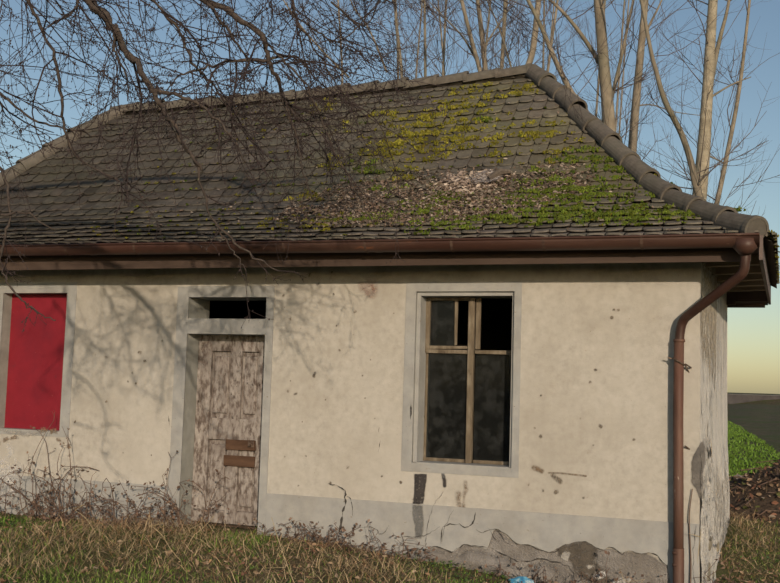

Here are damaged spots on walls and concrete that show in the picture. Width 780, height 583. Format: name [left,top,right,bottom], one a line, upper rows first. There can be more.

flaking render [701,268,717,389]
leakage [413,505,423,538]
crack [291,483,574,578]
spalling [404,530,671,583]
spalling [692,400,729,583]